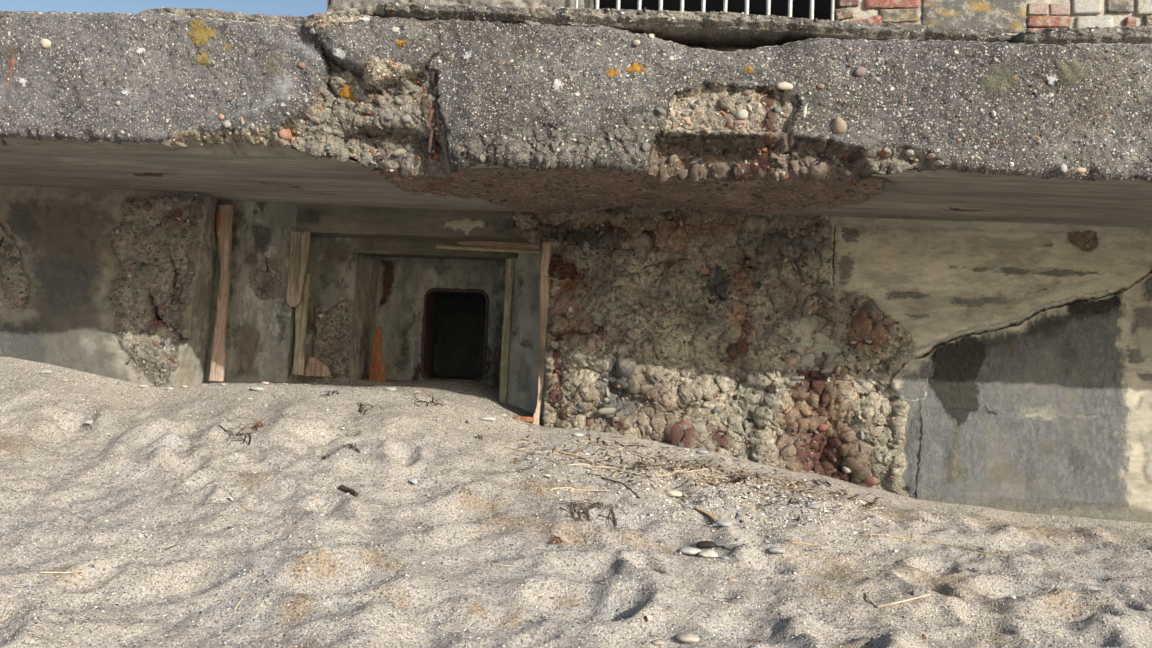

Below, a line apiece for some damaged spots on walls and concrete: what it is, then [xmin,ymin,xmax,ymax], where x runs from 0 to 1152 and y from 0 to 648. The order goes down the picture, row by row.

spalling [0,2,1152,497]
crack [890,271,1152,382]
leakage [950,266,1097,277]
corrosion [779,362,867,487]
crack [914,397,923,499]
leakage [887,277,1152,523]